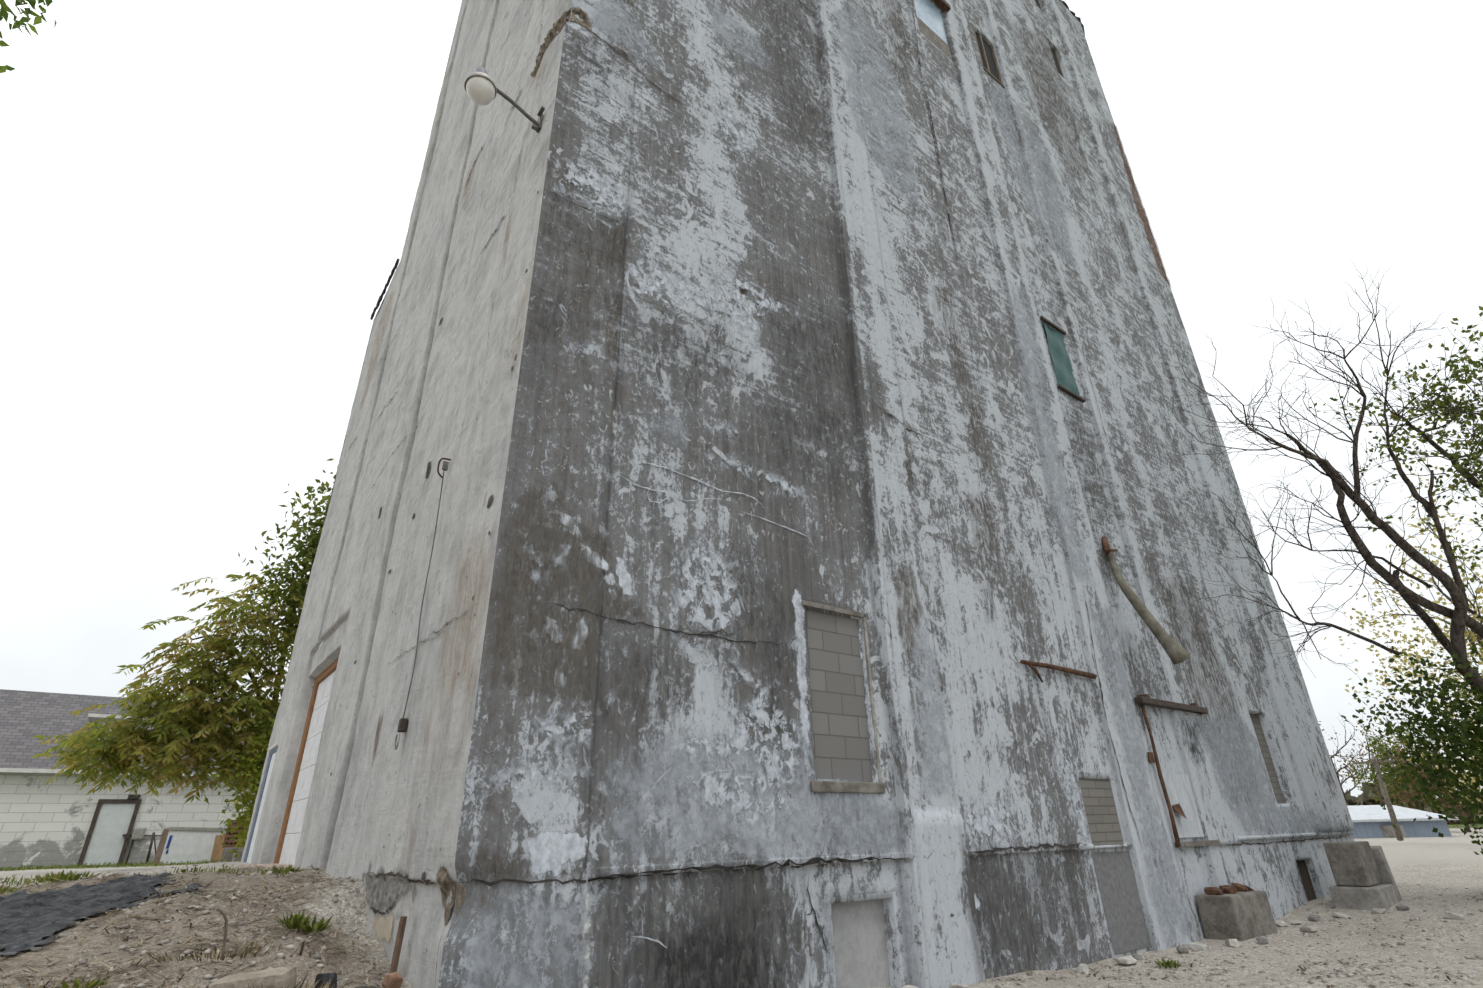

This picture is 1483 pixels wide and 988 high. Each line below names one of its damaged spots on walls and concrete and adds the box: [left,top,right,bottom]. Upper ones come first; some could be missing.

spalling [531,7,592,77]
peeling [557,159,798,362]
peeling [709,454,803,497]
peeling [524,490,634,600]
crack [389,604,476,664]
crack [531,602,788,647]
peeling [475,813,588,881]
crack [970,842,1087,853]
spalling [378,848,456,925]
crack [368,856,908,953]
water stain [583,894,591,988]
water stain [656,921,772,988]